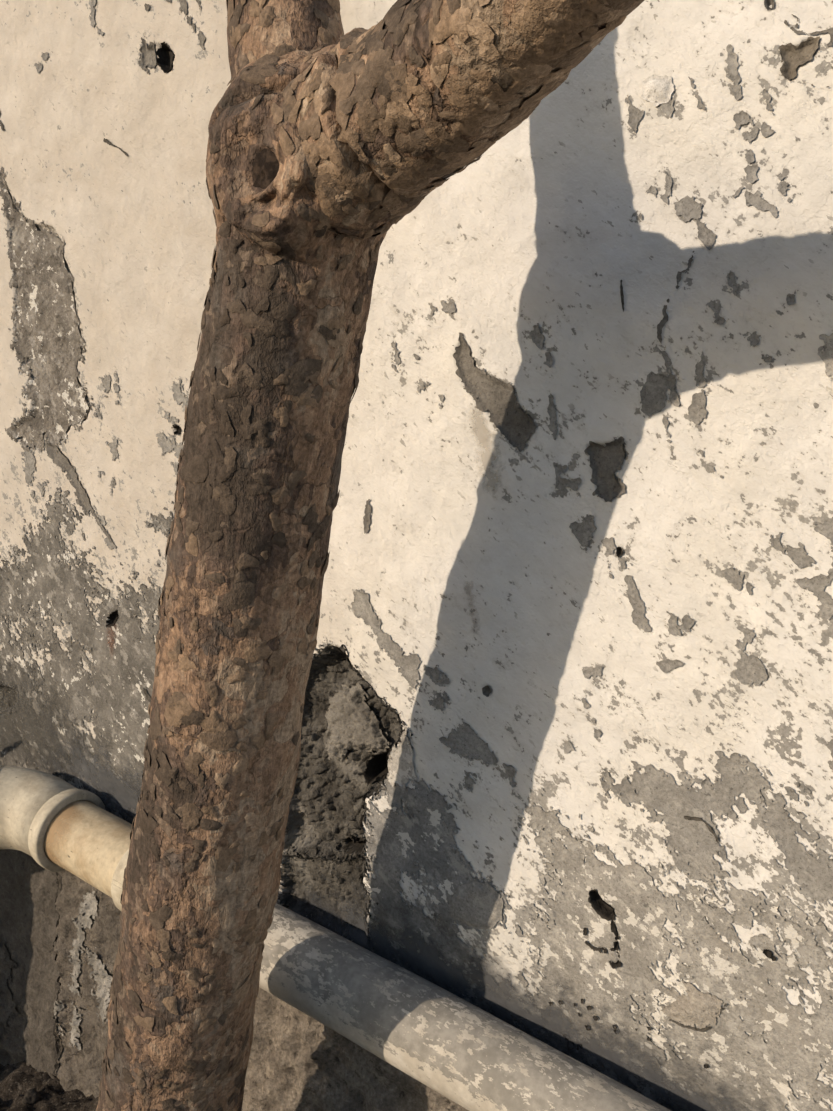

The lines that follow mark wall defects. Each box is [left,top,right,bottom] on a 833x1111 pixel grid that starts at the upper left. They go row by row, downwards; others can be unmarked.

flaking render [779,36,820,80]
peeling [726,44,792,218]
peeling [645,170,716,250]
flaking render [452,332,558,452]
peeling [640,351,707,460]
peeling [0,167,167,823]
flaking render [553,436,627,502]
peeling [569,514,651,632]
peeling [764,517,833,620]
peeling [351,589,450,712]
peeling [735,626,768,686]
peeling [278,637,833,1111]